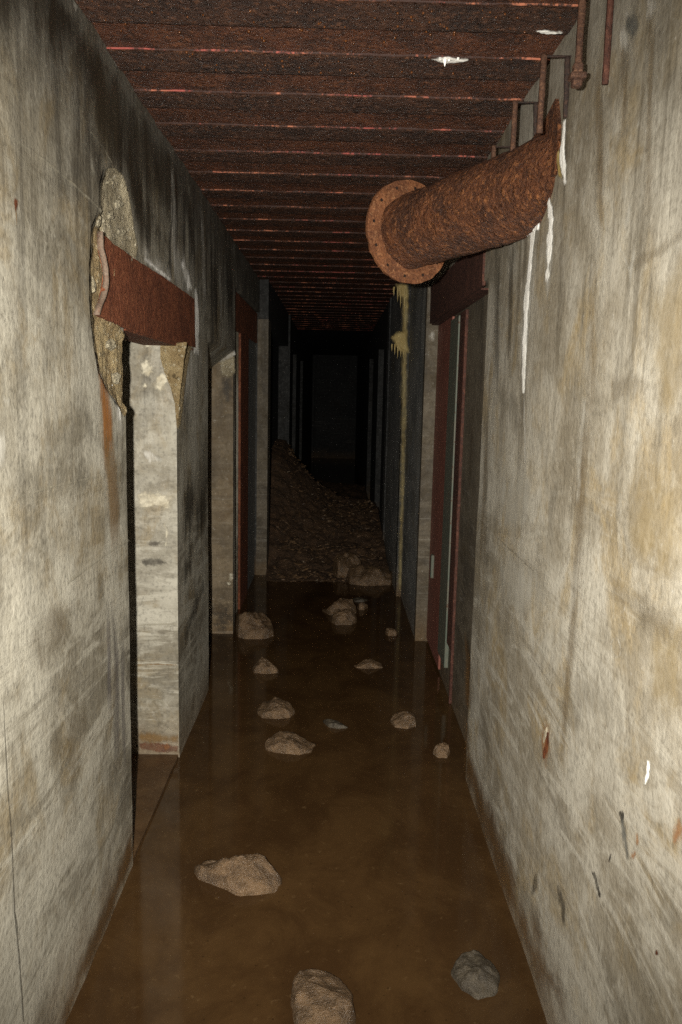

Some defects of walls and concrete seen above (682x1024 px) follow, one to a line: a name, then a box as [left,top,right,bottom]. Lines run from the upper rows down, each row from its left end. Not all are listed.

leakage [556,120,566,184]
spalling [89,167,138,416]
leakage [522,199,554,393]
corrosion [101,380,111,447]
spalling [141,342,191,427]